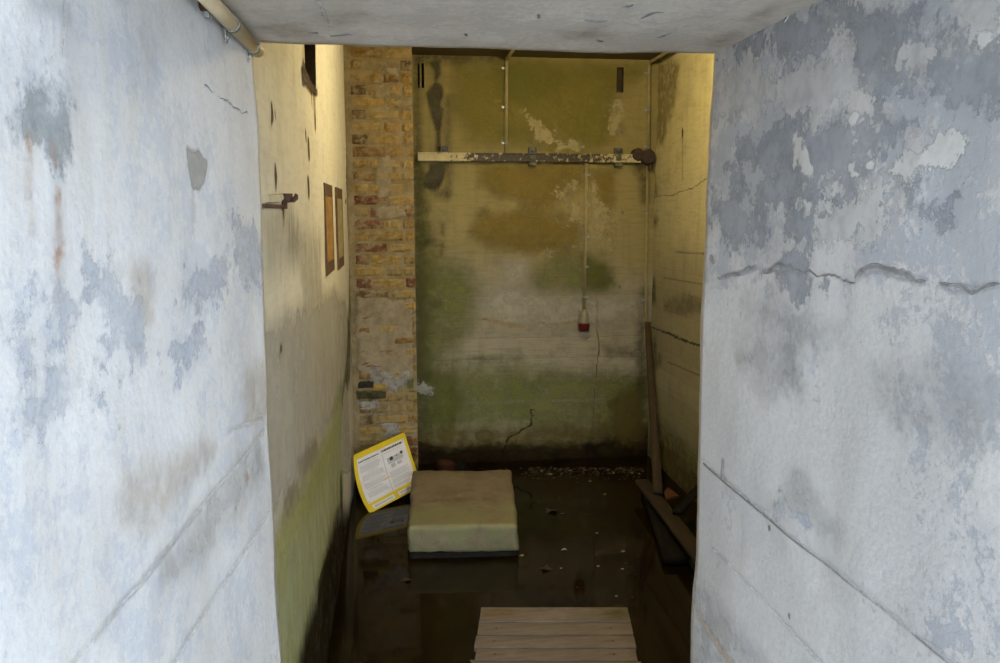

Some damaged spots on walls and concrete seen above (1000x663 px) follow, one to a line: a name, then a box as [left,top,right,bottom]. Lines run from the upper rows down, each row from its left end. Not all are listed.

crack [203,83,248,114]
peeling [518,108,585,153]
peeling [603,98,630,137]
peeling [708,0,1000,309]
damp [412,55,697,503]
crack [717,261,1000,295]
crack [502,296,600,461]
damp [299,507,351,663]